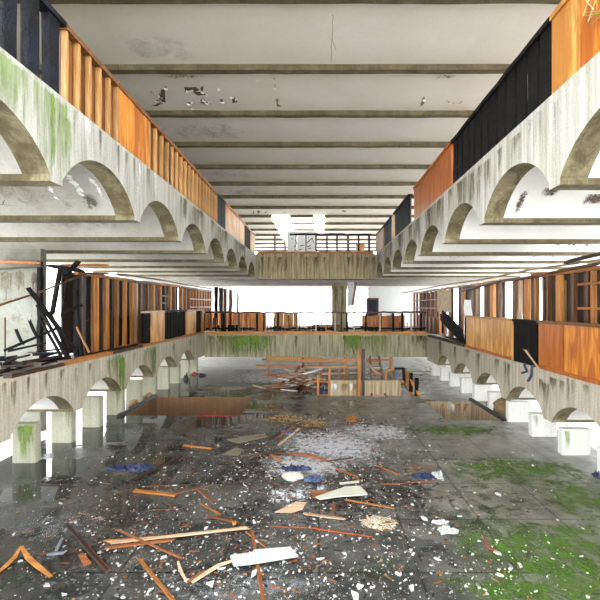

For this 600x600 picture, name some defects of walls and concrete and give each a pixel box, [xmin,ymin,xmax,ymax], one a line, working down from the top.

peeling [150,86,168,106]
peeling [184,86,211,110]
leakage [34,82,71,154]
leakage [457,160,489,203]
peeling [584,194,600,204]
leakage [386,200,440,256]
leakage [209,335,276,351]
leakage [343,336,386,350]
leakage [109,355,125,390]